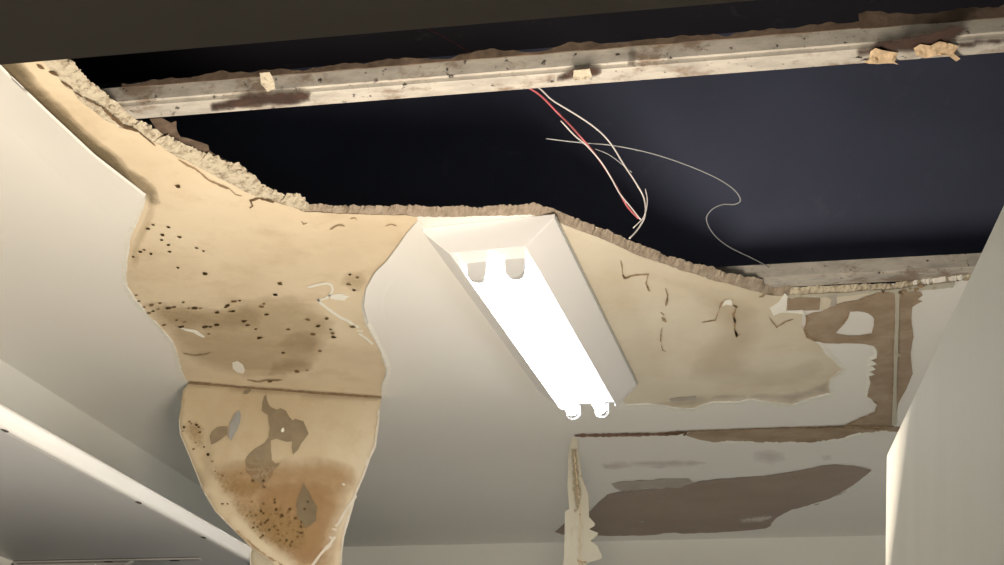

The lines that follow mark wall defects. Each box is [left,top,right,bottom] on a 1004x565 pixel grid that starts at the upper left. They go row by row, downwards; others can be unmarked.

peeling [42,59,972,413]
peeling [12,61,418,565]
mould [202,300,263,339]
leakage [182,421,346,565]
peeling [589,464,872,536]